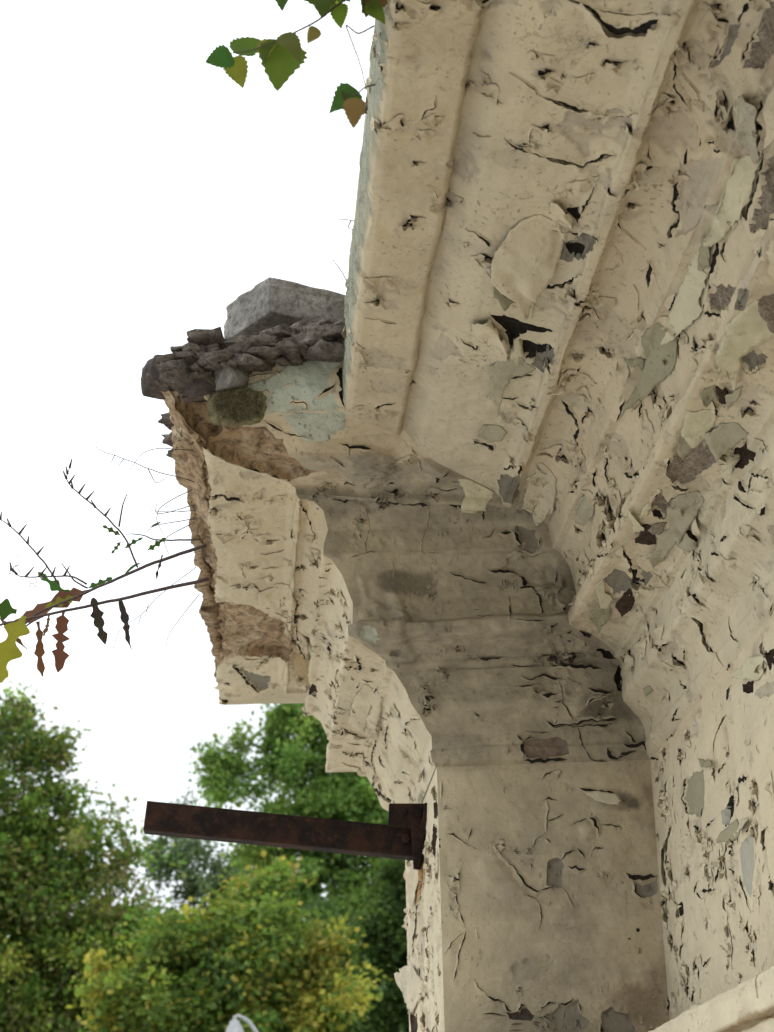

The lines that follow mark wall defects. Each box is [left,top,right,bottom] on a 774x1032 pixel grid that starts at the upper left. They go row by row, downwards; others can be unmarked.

spalling [699,0,774,70]
peeling [429,88,774,699]
spalling [161,361,402,803]
crack [208,362,679,804]
crack [681,530,735,580]
crack [733,445,773,516]
spalling [516,731,569,780]
crack [445,615,758,1032]
peeling [596,714,774,1012]
crack [760,827,768,873]
crack [412,868,558,1032]
spalling [503,982,653,1032]